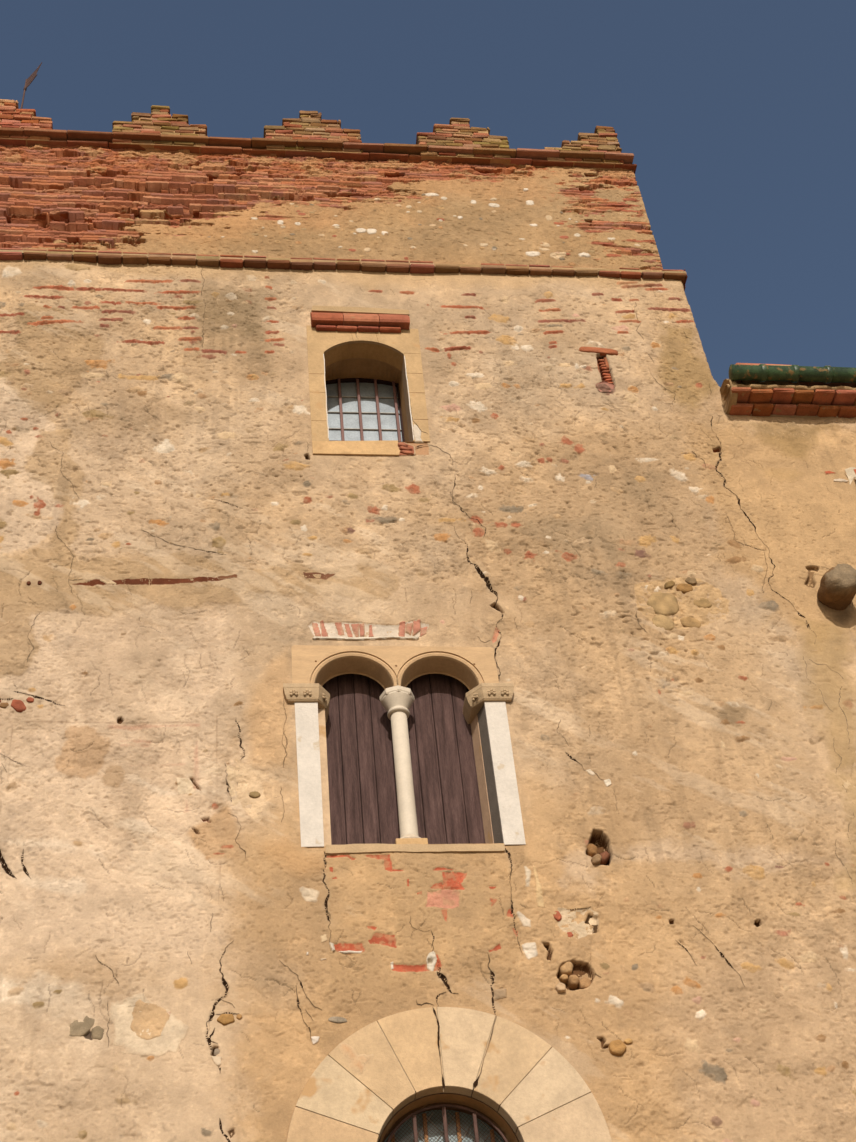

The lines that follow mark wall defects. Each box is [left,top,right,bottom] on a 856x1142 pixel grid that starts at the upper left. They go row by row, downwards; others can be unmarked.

spalling [7,213,69,228]
crack [404,360,503,679]
crack [692,384,856,884]
spalling [586,830,611,866]
crack [280,961,322,1039]
crack [322,851,331,943]
crack [409,916,459,1092]
crack [473,969,507,1088]
crack [505,848,522,952]
spalling [543,944,600,993]
flaking render [553,906,600,940]